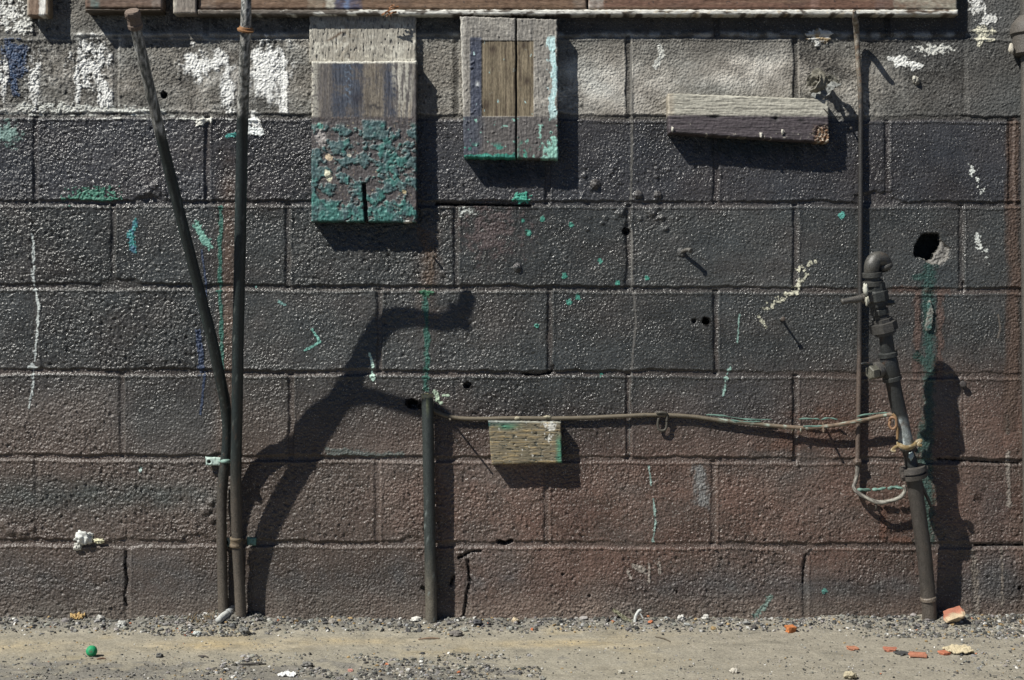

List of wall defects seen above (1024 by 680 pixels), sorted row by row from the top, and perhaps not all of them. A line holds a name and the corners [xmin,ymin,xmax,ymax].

hole [914,234,949,265]